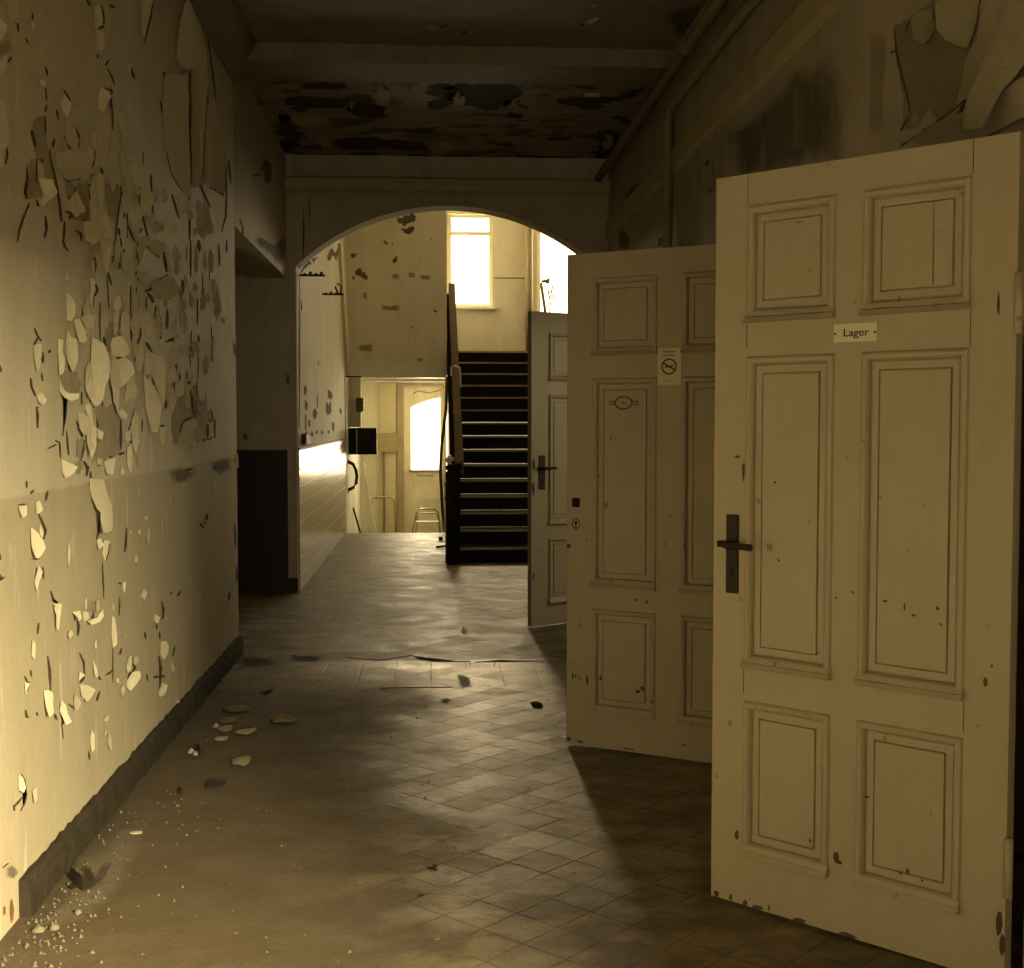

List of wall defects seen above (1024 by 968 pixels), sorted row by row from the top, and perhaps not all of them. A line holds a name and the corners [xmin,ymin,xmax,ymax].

peeling [177,0,202,70]
peeling [958,0,1024,130]
flaking render [273,81,475,157]
flaking render [425,83,529,119]
flaking render [397,214,416,235]
flaking render [351,253,368,280]
flaking render [298,247,342,437]
peeling [17,90,231,739]
crack [345,655,544,665]
crack [393,683,452,691]
peeling [88,715,112,760]
flaking render [13,774,37,811]